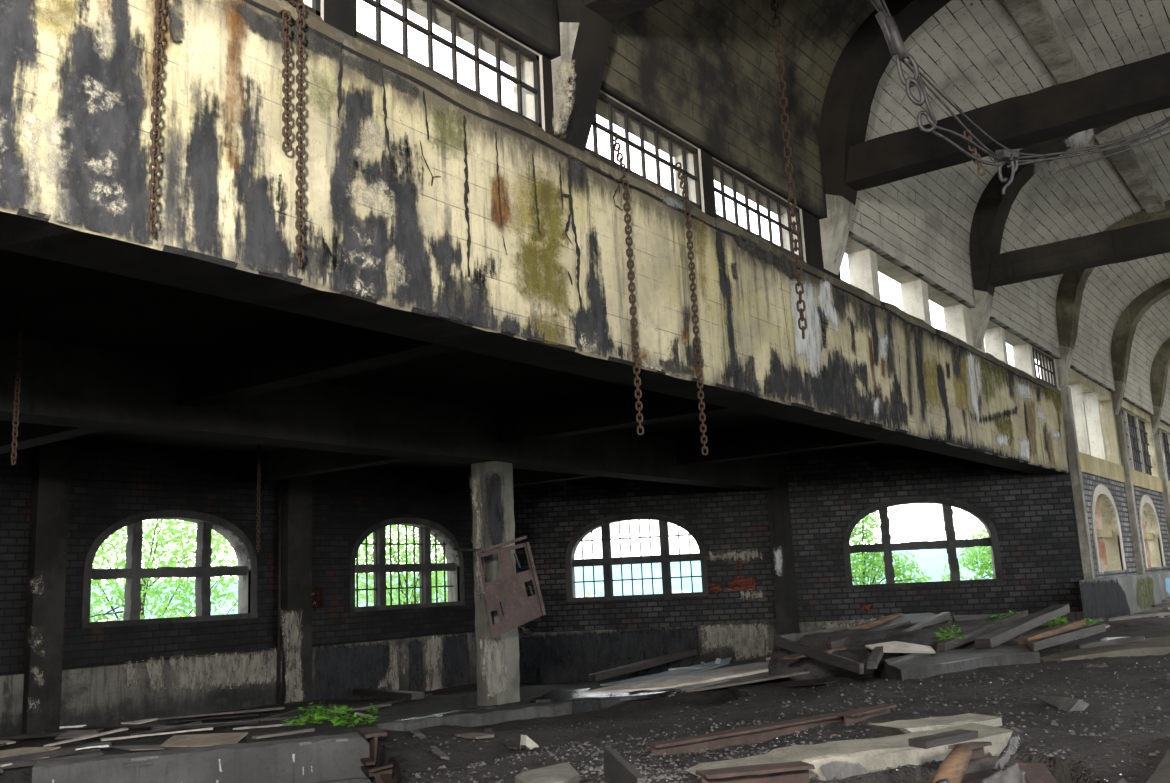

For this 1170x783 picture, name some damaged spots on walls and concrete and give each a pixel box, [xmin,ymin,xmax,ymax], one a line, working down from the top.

corrosion [225,3,244,167]
water stain [355,135,423,193]
corrosion [491,175,510,231]
water stain [791,281,888,414]
water stain [905,327,982,424]
water stain [997,384,1059,466]
peeling [472,476,485,597]
peeling [125,587,323,704]
peeling [378,645,407,690]
peeling [425,635,442,691]
peeling [480,637,508,698]
peeling [701,623,773,661]